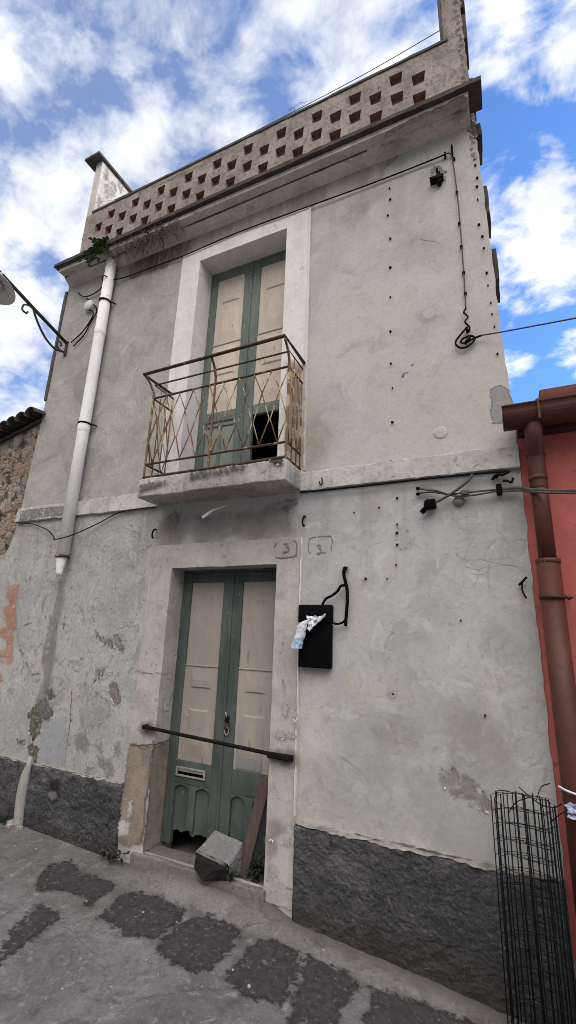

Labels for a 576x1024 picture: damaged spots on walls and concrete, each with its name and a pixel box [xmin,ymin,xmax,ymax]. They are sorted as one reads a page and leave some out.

flaking render [489,385,515,423]
flaking render [77,667,120,731]
flaking render [117,739,170,852]
flaking render [440,767,494,814]